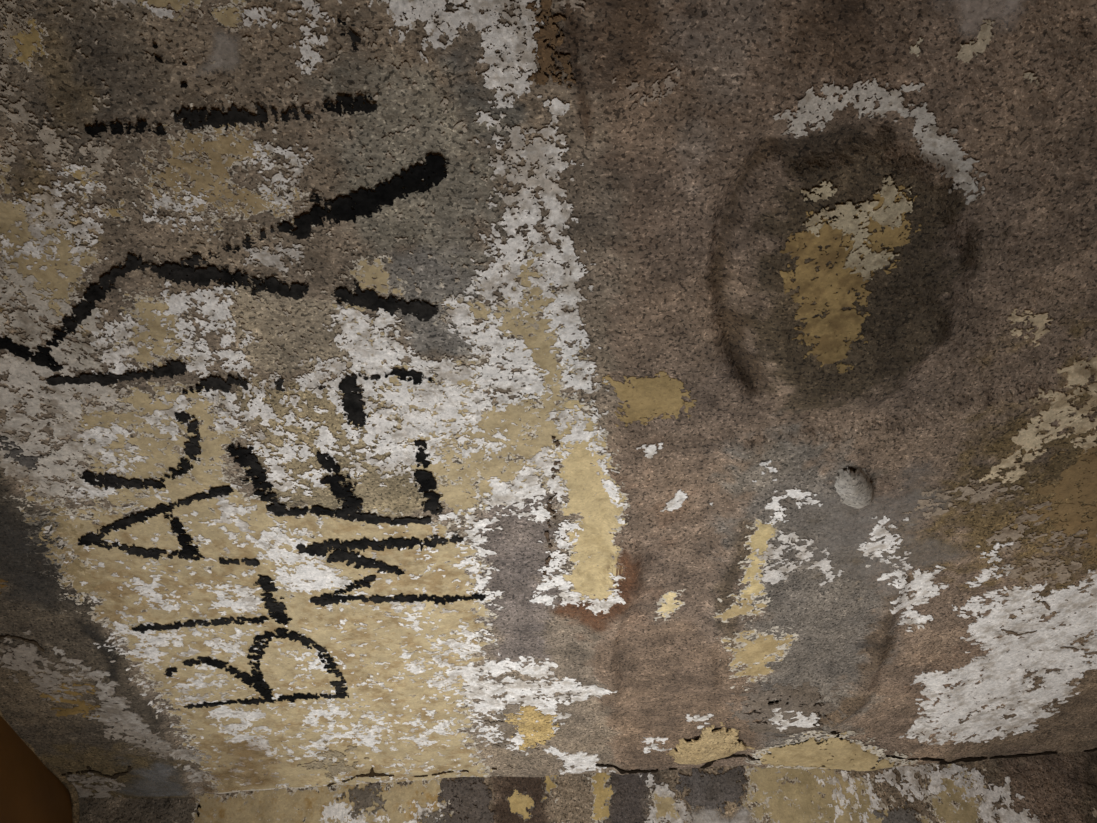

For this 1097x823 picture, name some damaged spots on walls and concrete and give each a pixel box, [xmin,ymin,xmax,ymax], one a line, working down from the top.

peeling [0,0,697,823]
peeling [780,175,921,373]
peeling [1008,308,1053,347]
damp [808,492,958,588]
peeling [857,355,1097,745]
peeling [640,708,1040,823]